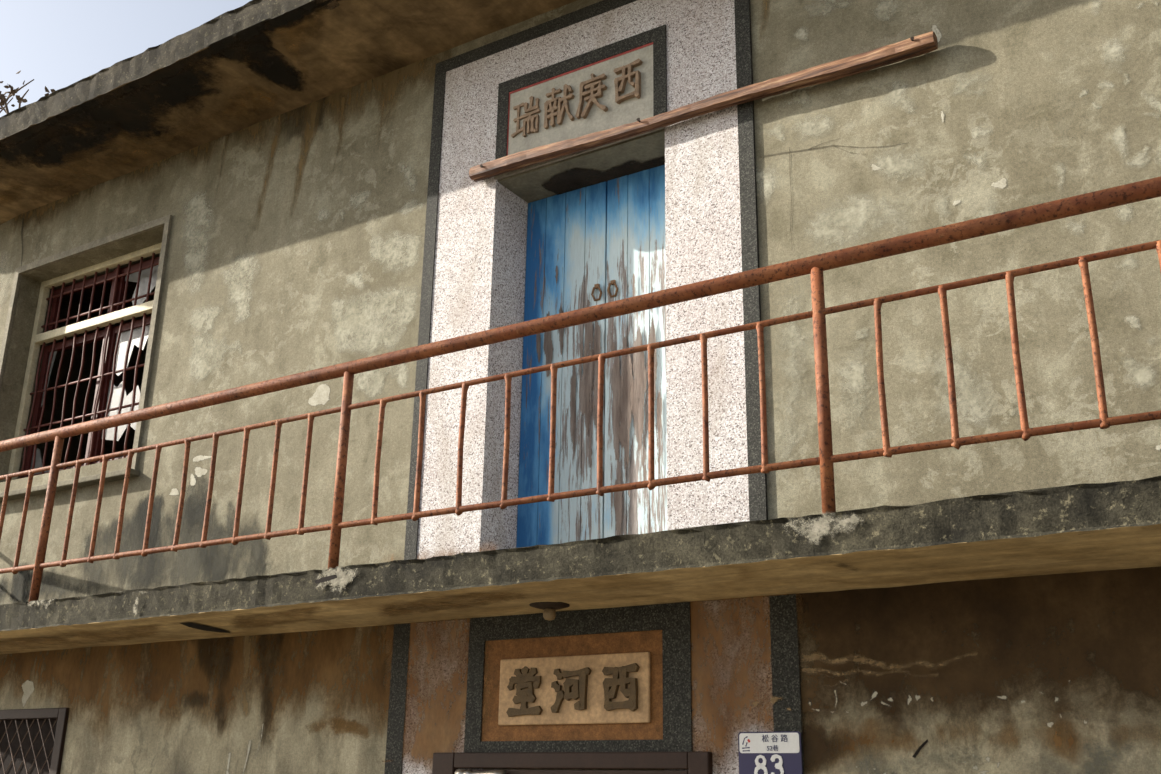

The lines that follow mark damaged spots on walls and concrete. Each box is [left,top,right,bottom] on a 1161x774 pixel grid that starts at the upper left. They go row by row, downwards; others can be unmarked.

damp [0,0,449,227]
damp [0,481,265,601]
spalling [315,566,357,591]
spalling [786,513,863,543]
damp [0,594,521,774]
damp [679,566,1161,774]